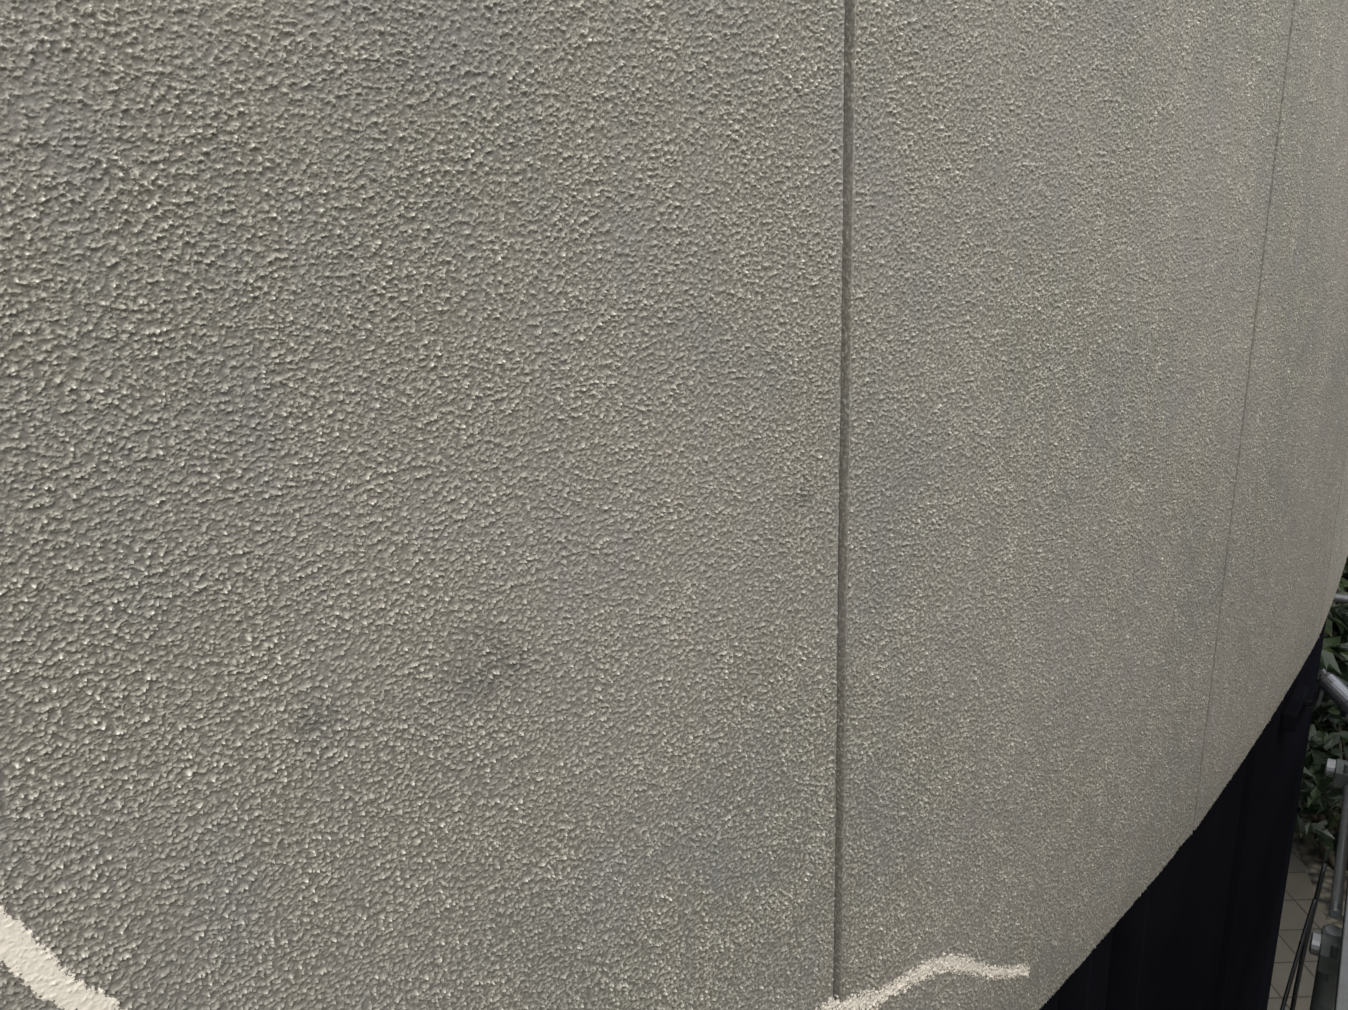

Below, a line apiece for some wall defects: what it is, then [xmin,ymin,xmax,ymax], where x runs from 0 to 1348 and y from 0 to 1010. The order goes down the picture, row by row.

crack [0,899,127,1010]
crack [815,951,1030,1010]